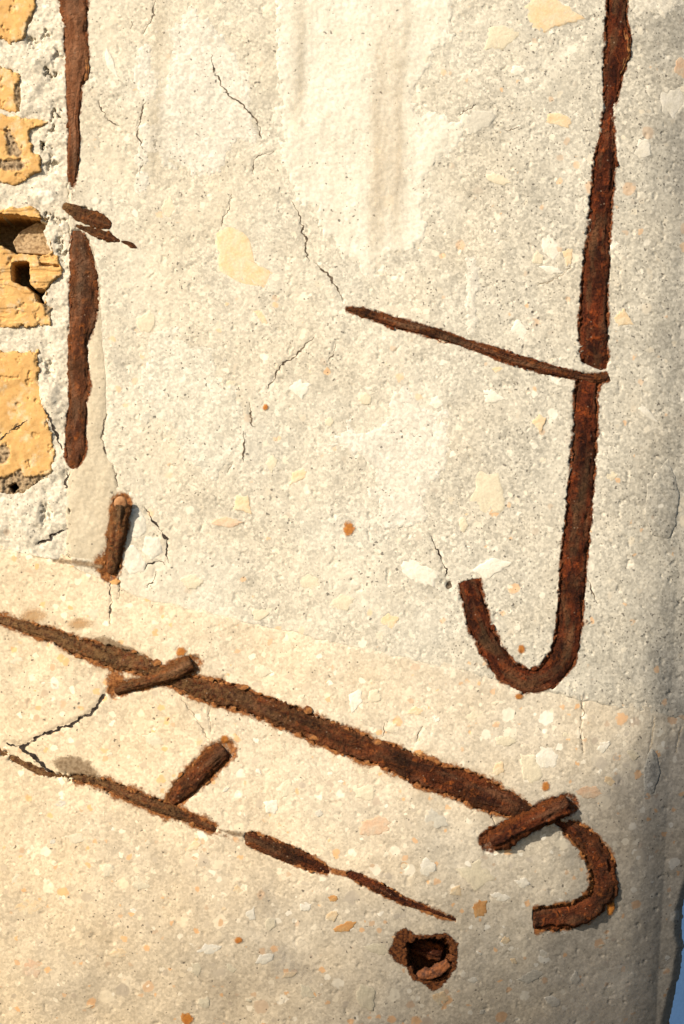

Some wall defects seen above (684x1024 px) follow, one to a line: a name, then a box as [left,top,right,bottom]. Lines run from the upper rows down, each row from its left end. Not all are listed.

crack [211,55,264,172]
crack [292,202,343,302]
corrosion [63,232,99,466]
corrosion [345,0,628,637]
corrosion [94,492,133,582]
corrosion [458,583,578,699]
corrosion [476,503,569,671]
crack [6,693,105,774]
corrosion [0,611,512,852]
corrosion [247,831,329,877]
corrosion [342,725,616,911]
corrosion [347,870,459,991]